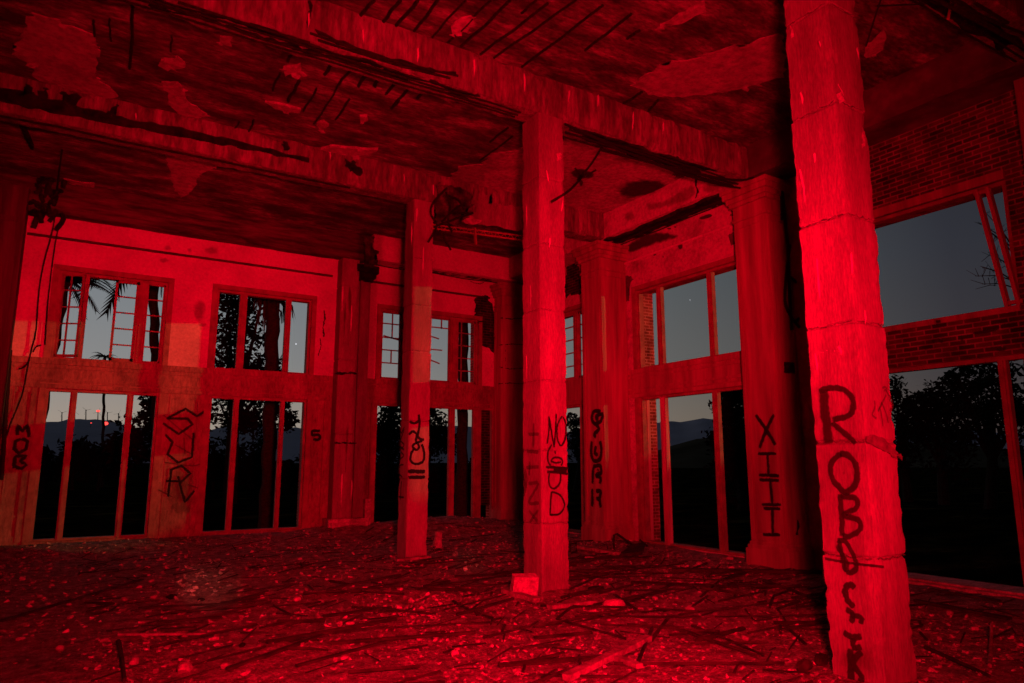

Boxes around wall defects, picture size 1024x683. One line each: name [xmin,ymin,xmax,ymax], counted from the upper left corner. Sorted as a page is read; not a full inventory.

peeling [0,12,350,197]
spalling [119,0,524,250]
spalling [480,0,577,59]
spalling [521,4,604,68]
spalling [584,13,632,52]
peeling [623,24,794,112]
peeling [556,129,725,213]
spalling [474,295,495,353]